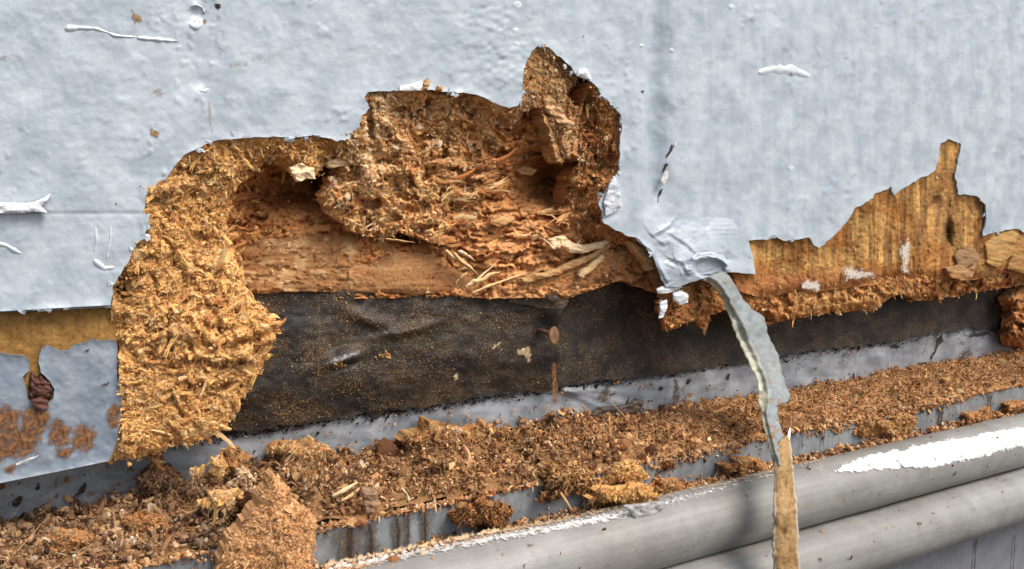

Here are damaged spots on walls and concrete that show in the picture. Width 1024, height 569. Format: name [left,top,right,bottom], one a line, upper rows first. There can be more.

spalling [108,43,682,466]
peeling [654,139,1024,569]